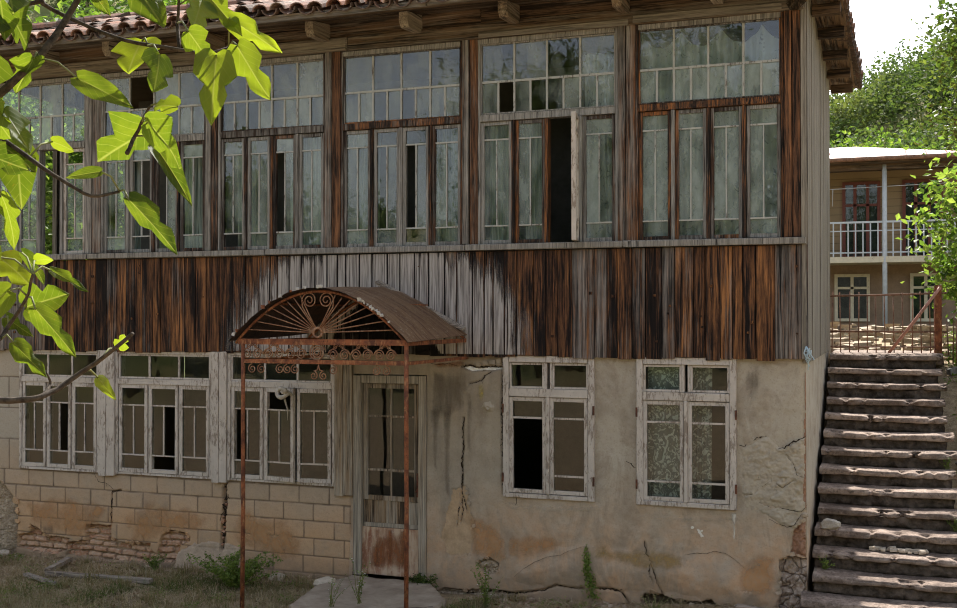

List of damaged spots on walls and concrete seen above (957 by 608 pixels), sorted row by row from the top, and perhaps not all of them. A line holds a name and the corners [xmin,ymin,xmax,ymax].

crack [431,362,503,457]
spalling [0,480,190,563]
crack [220,482,230,548]
corrosion [372,531,404,566]
crack [457,418,467,524]
spalling [772,372,809,608]